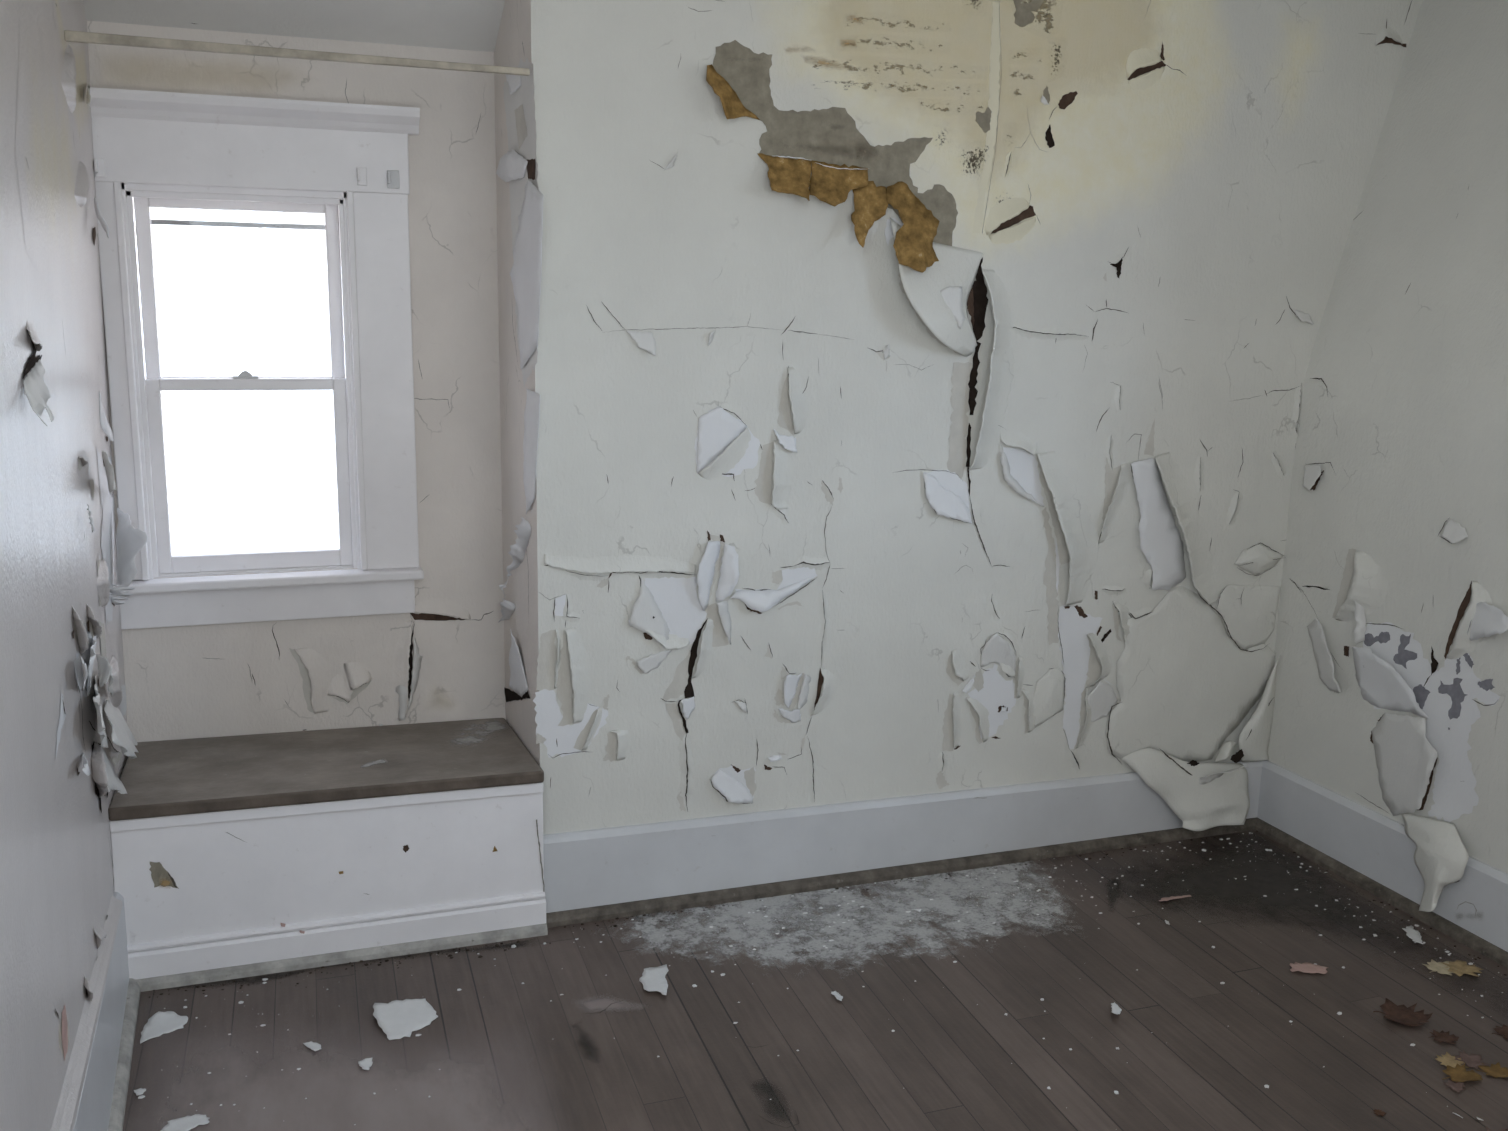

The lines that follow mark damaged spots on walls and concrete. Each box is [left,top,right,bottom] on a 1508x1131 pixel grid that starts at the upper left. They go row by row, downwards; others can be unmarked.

spalling [1013,0,1044,27]
spalling [706,40,983,357]
damp [734,0,1263,285]
spalling [22,319,55,426]
peeling [694,406,794,480]
spalling [74,391,148,813]
peeling [626,555,830,674]
peeling [710,736,805,804]
peeling [962,591,1118,749]
peeling [1121,656,1280,831]
peeling [1127,420,1281,649]
spalling [1307,600,1508,944]